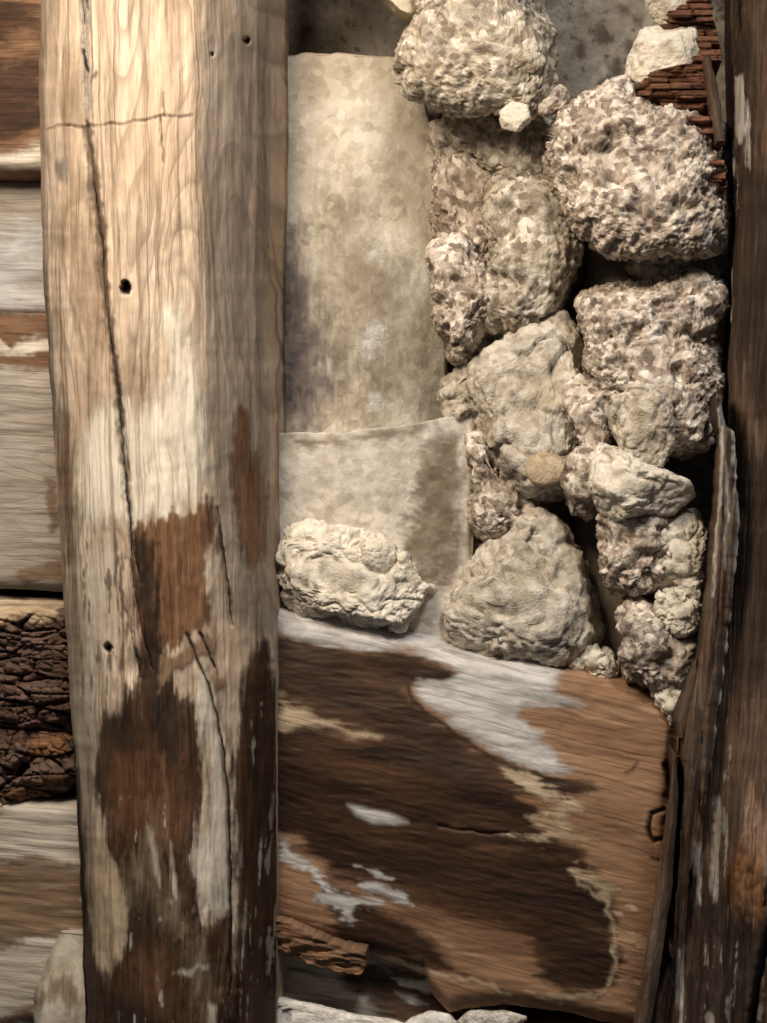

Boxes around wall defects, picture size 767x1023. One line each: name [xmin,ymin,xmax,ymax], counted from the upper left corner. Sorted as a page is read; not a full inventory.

crack [735,0,743,30]
crack [82,48,96,76]
crack [116,377,124,428]
crack [119,454,140,605]
crack [132,639,152,678]
crack [750,932,767,1023]